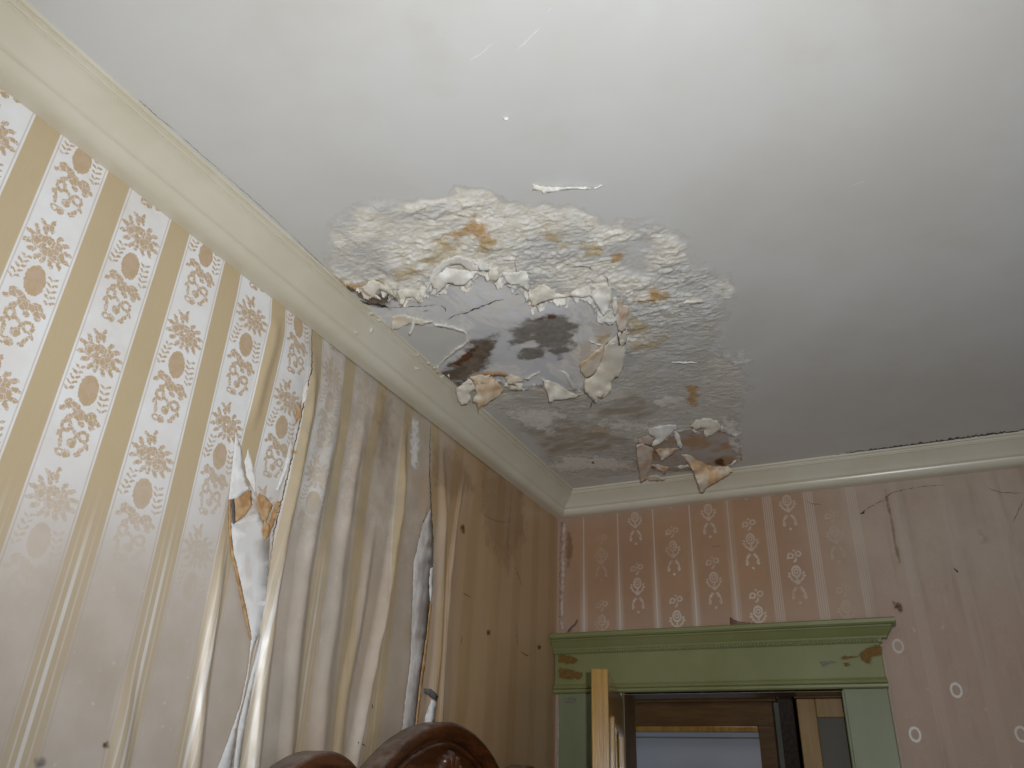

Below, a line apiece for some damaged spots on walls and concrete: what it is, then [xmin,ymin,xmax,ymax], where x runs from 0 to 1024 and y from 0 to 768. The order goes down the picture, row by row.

peeling [346,255,630,411]
water stain [510,315,578,360]
water stain [441,339,497,391]
water stain [501,407,568,435]
water stain [546,455,638,472]
peeling [635,418,743,494]
flaking render [231,490,273,523]
peeling [821,645,882,666]